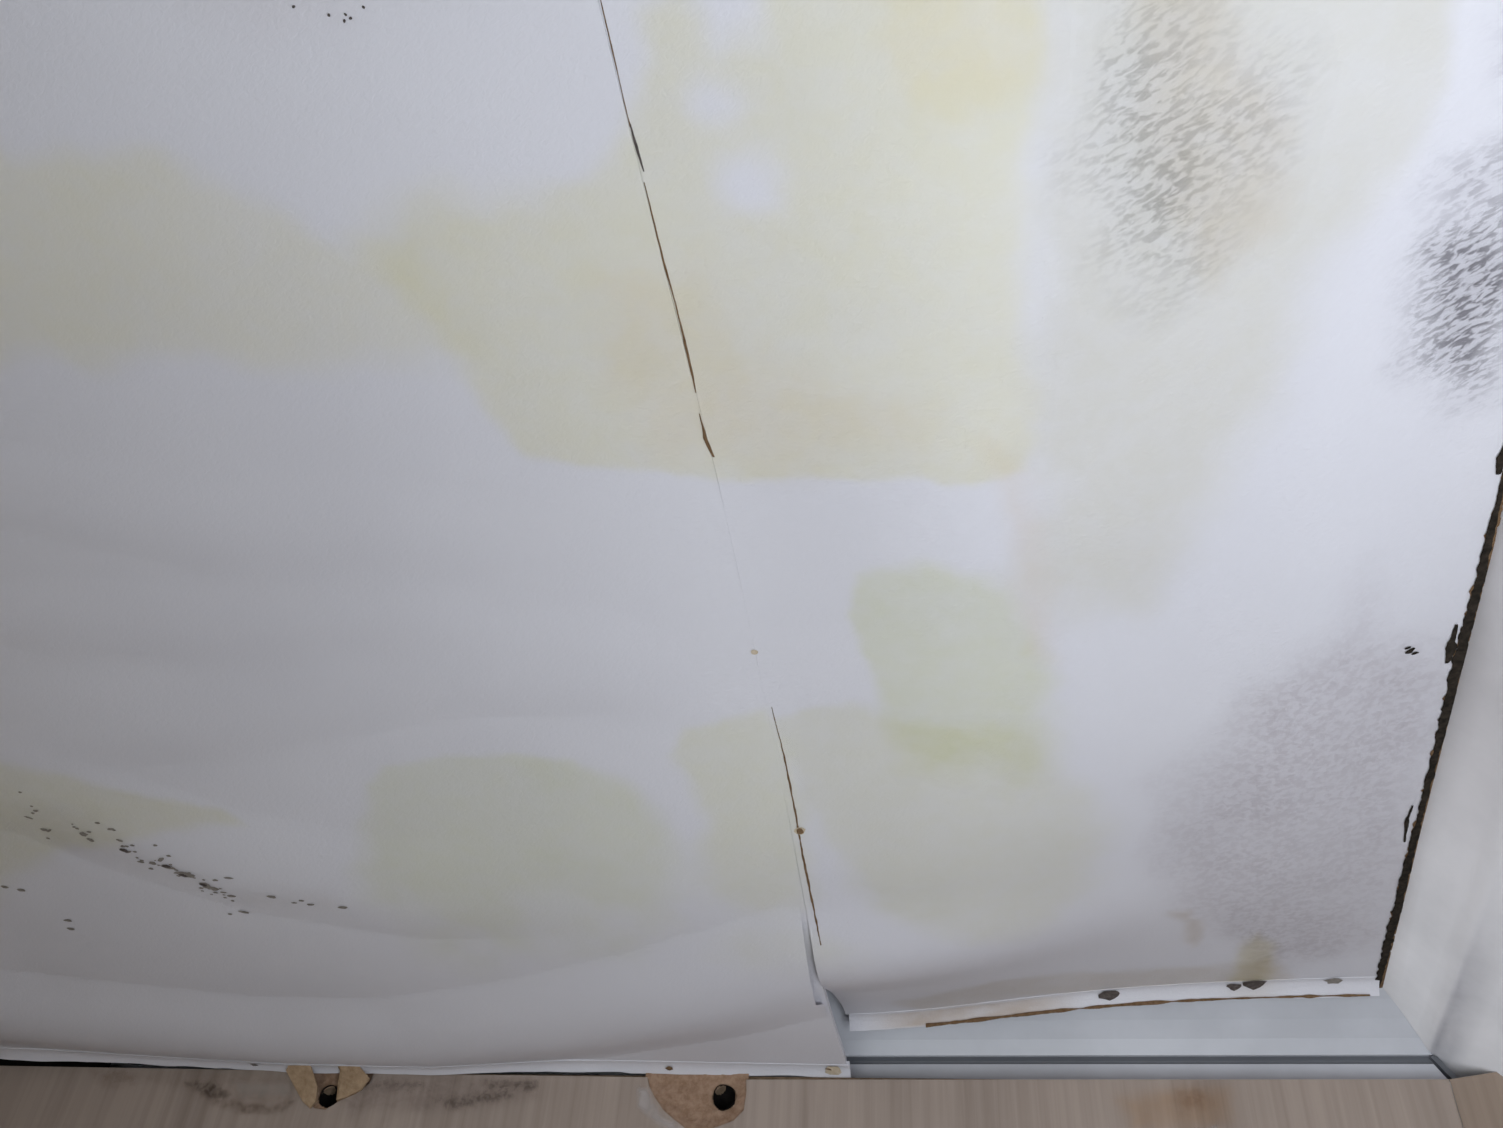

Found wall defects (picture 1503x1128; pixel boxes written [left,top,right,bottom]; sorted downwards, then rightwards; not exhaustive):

water stain [600,0,644,172]
water stain [72,822,249,915]
peeling [849,977,1380,1031]